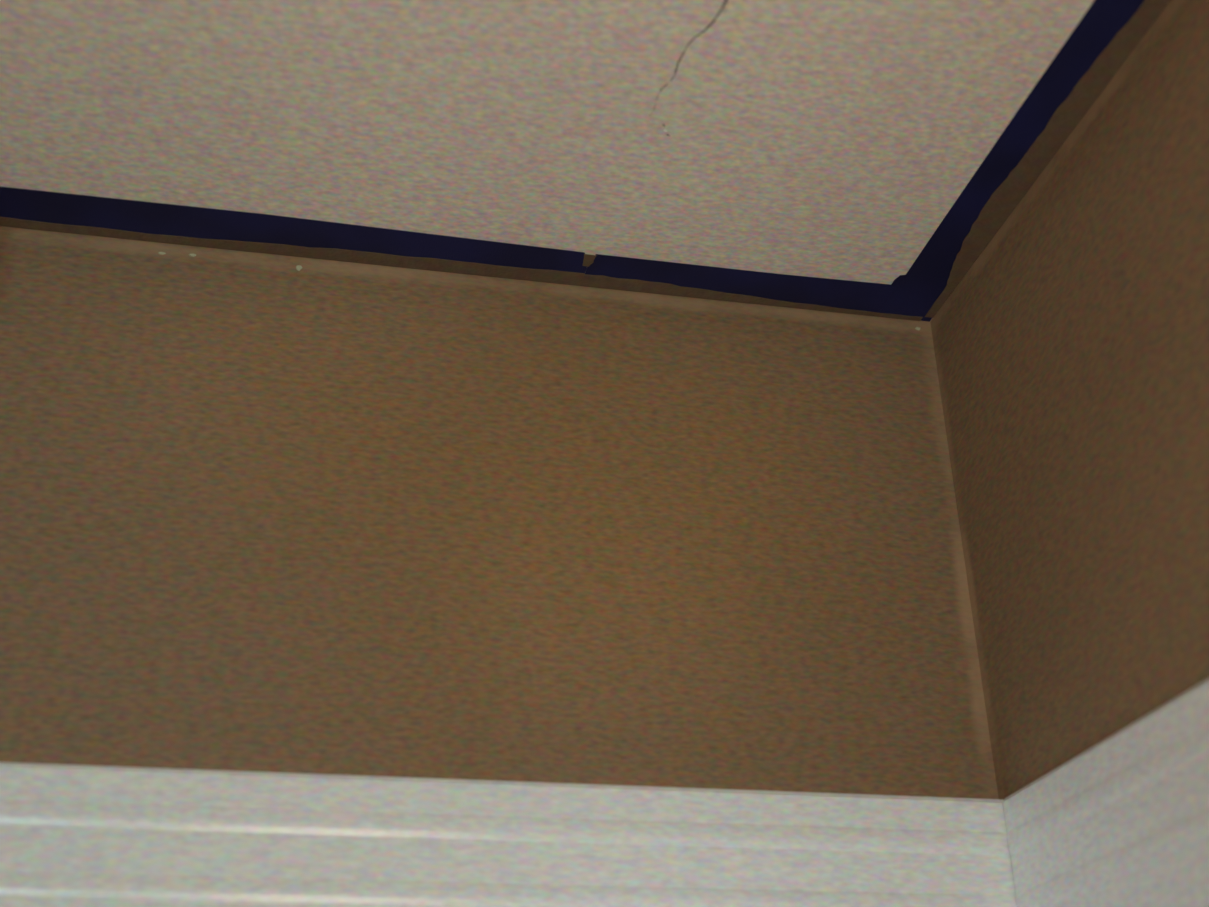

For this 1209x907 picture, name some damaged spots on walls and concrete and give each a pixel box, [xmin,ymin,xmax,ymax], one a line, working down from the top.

crack [675,0,727,73]